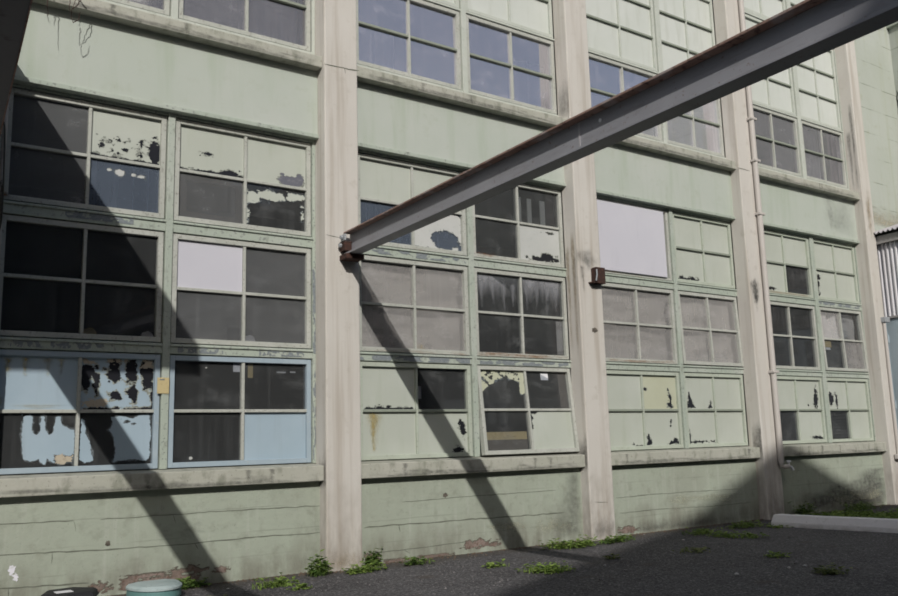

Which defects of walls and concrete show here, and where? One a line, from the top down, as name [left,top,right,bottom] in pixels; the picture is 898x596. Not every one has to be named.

peeling [91,133,160,180]
peeling [180,166,243,178]
peeling [246,173,305,224]
peeling [372,214,466,264]
peeling [360,354,568,401]
peeling [19,358,154,466]
spalling [364,537,502,563]
spalling [88,564,231,594]